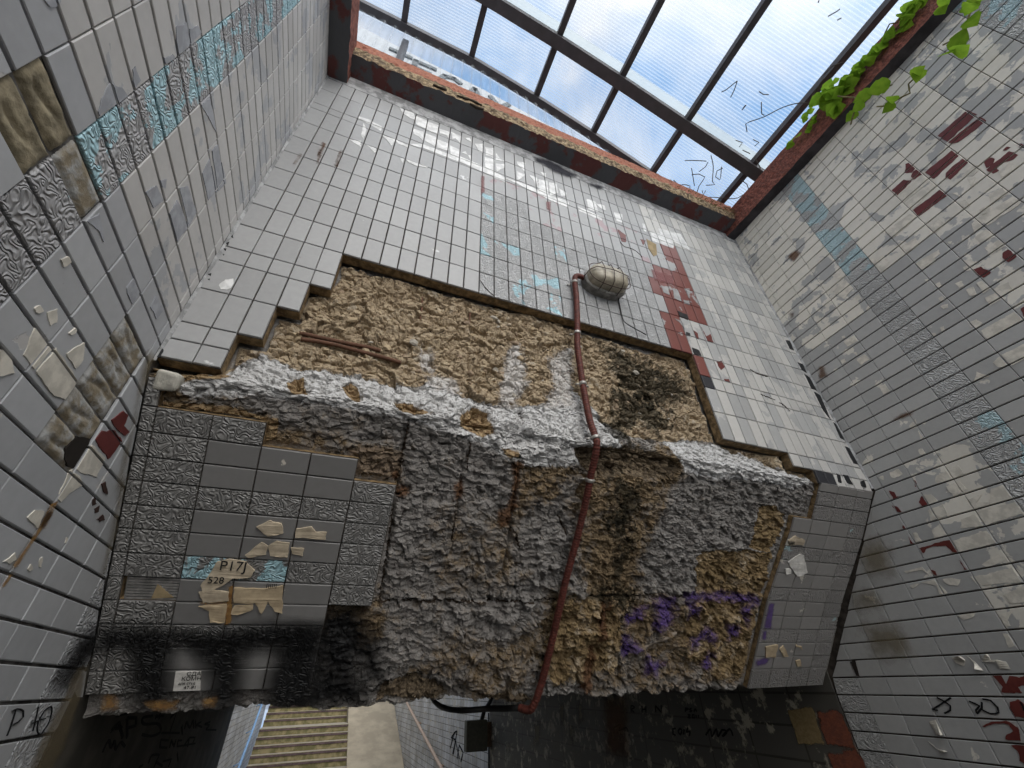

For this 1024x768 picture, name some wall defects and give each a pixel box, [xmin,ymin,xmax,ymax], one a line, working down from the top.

peeling [0,318,143,522]
spalling [164,267,807,480]
leakage [597,341,693,450]
corrosion [2,502,57,587]
peeling [124,576,181,600]
leakage [59,624,321,710]
spalling [375,672,447,701]
crack [365,420,758,605]
spalling [535,593,625,687]
spalling [682,505,785,680]